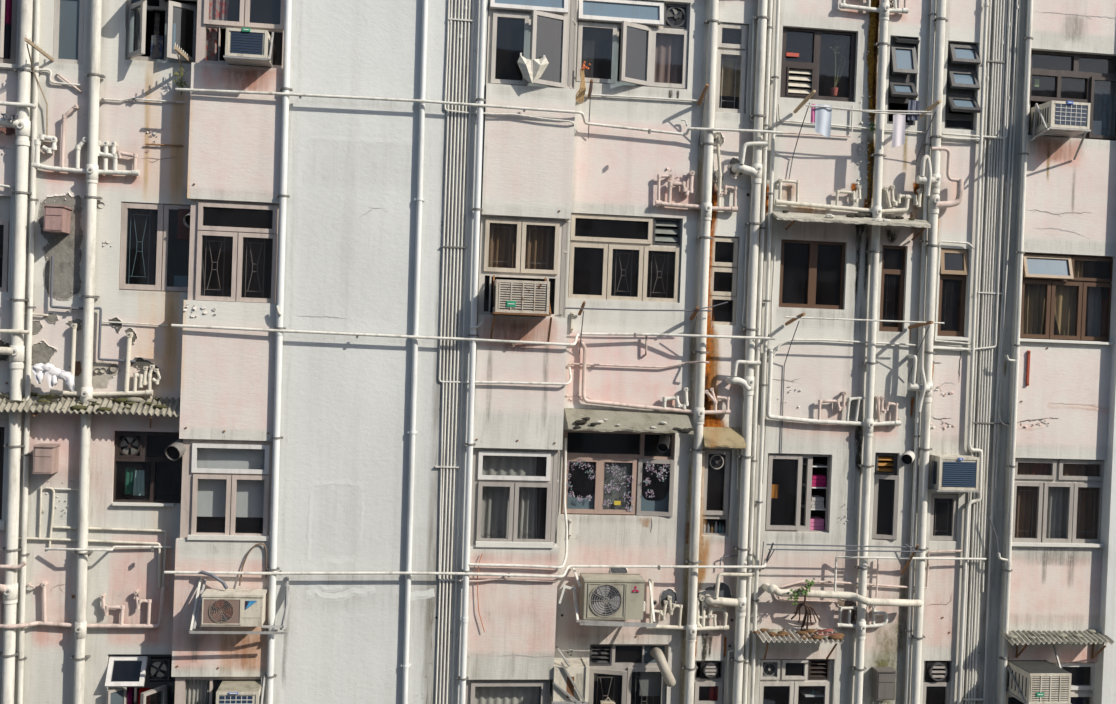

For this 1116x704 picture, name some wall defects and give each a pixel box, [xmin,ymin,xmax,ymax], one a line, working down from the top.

corrosion [867,0,880,122]
corrosion [851,139,875,208]
spalling [31,191,84,365]
corrosion [703,184,724,439]
spalling [0,338,10,361]
spalling [68,316,160,389]
corrosion [698,520,708,579]